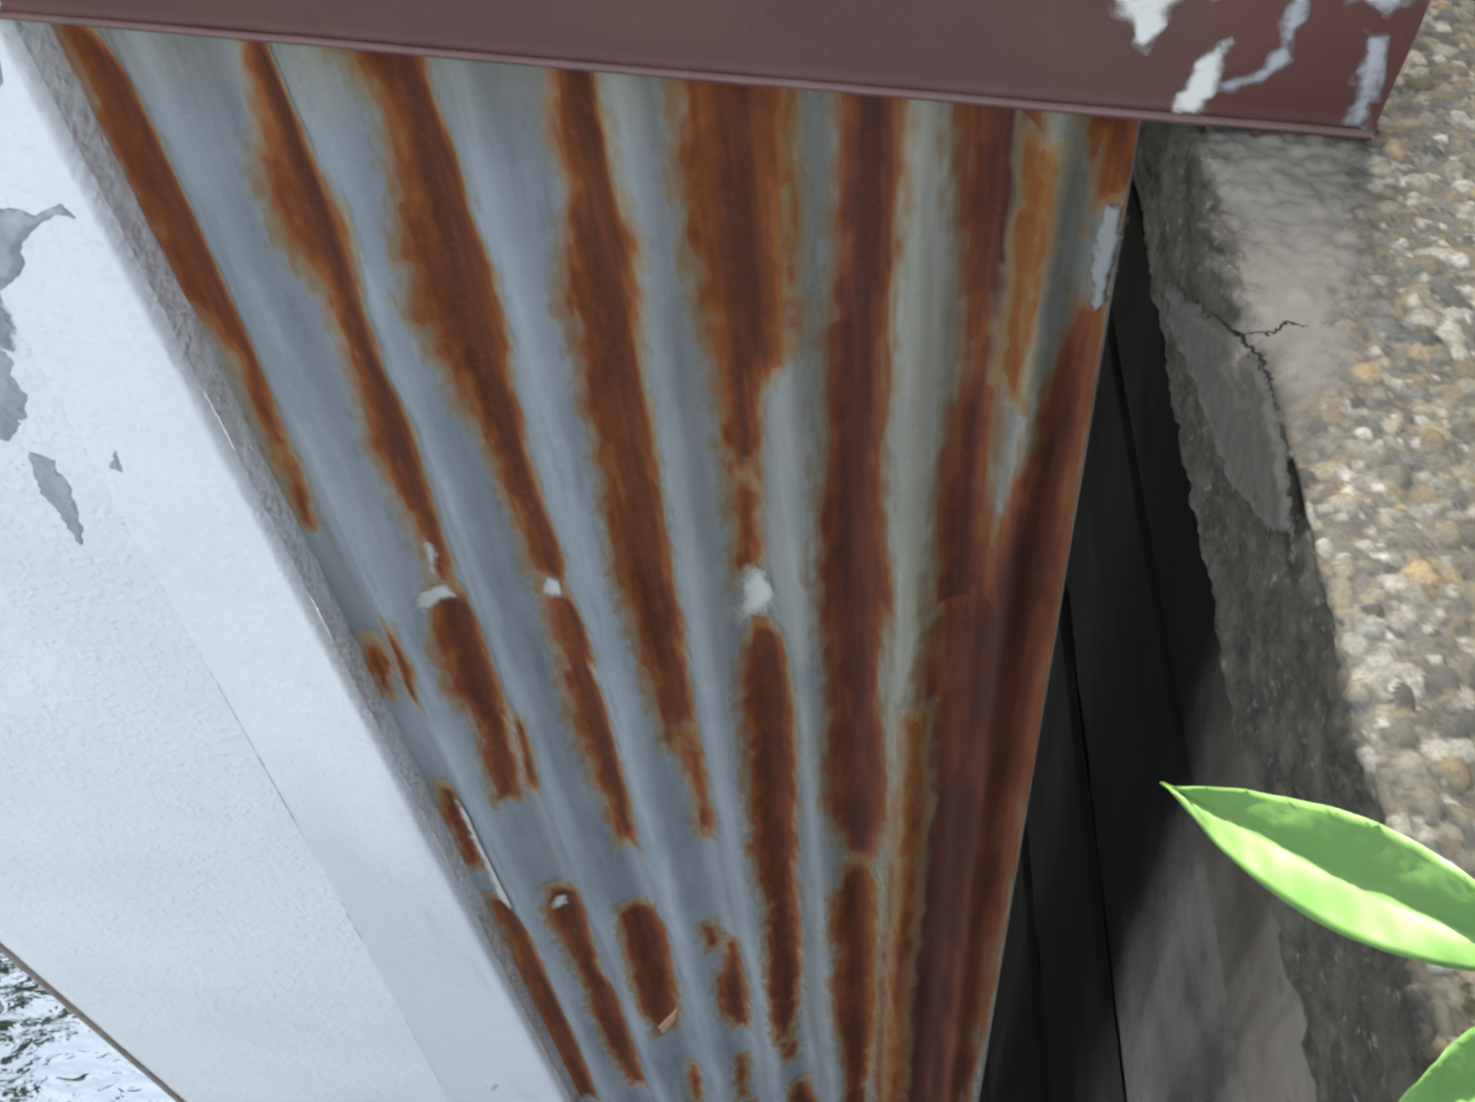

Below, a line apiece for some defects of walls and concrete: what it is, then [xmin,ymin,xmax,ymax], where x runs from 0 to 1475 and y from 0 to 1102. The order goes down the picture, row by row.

corrosion [50,23,321,533]
corrosion [238,40,641,852]
corrosion [434,778,489,872]
corrosion [482,880,683,1101]
corrosion [542,68,716,840]
corrosion [660,78,1139,1102]
crack [1210,311,1309,407]